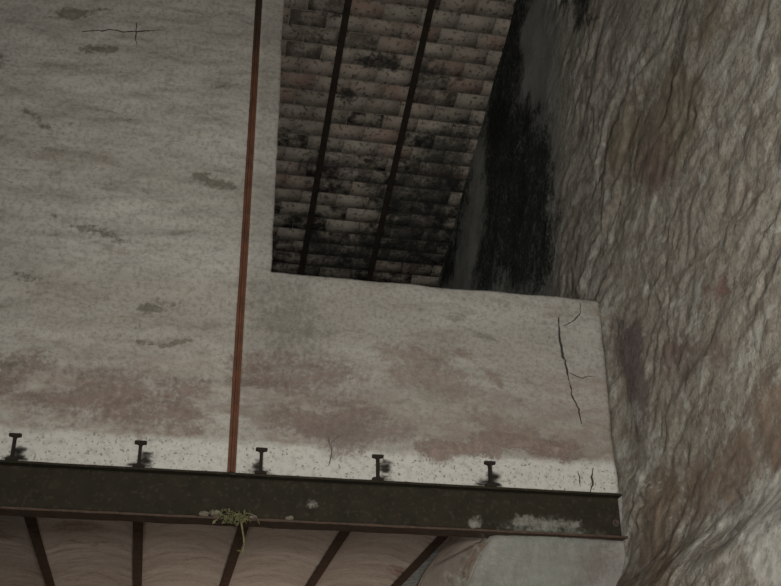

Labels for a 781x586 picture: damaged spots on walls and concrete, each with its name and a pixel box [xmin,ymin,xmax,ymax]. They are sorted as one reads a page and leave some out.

leakage [473,0,561,295]
crack [558,304,592,424]
leakage [417,418,580,463]